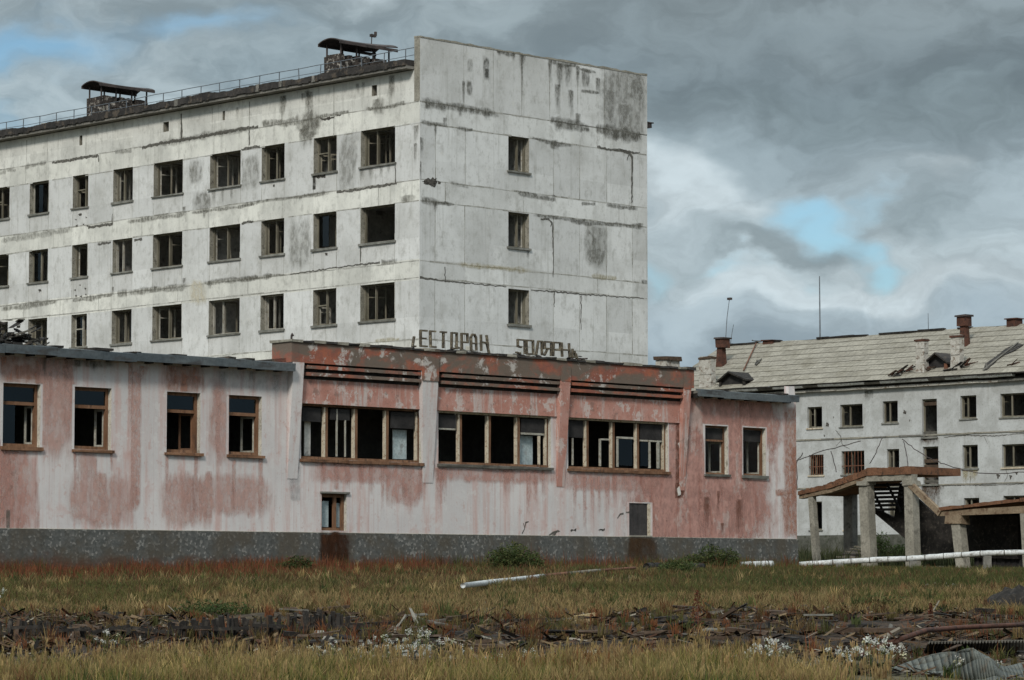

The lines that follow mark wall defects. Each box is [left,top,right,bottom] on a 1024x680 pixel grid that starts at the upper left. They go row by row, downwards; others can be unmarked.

water stain [548,61,626,110]
water stain [263,91,348,139]
water stain [551,115,640,140]